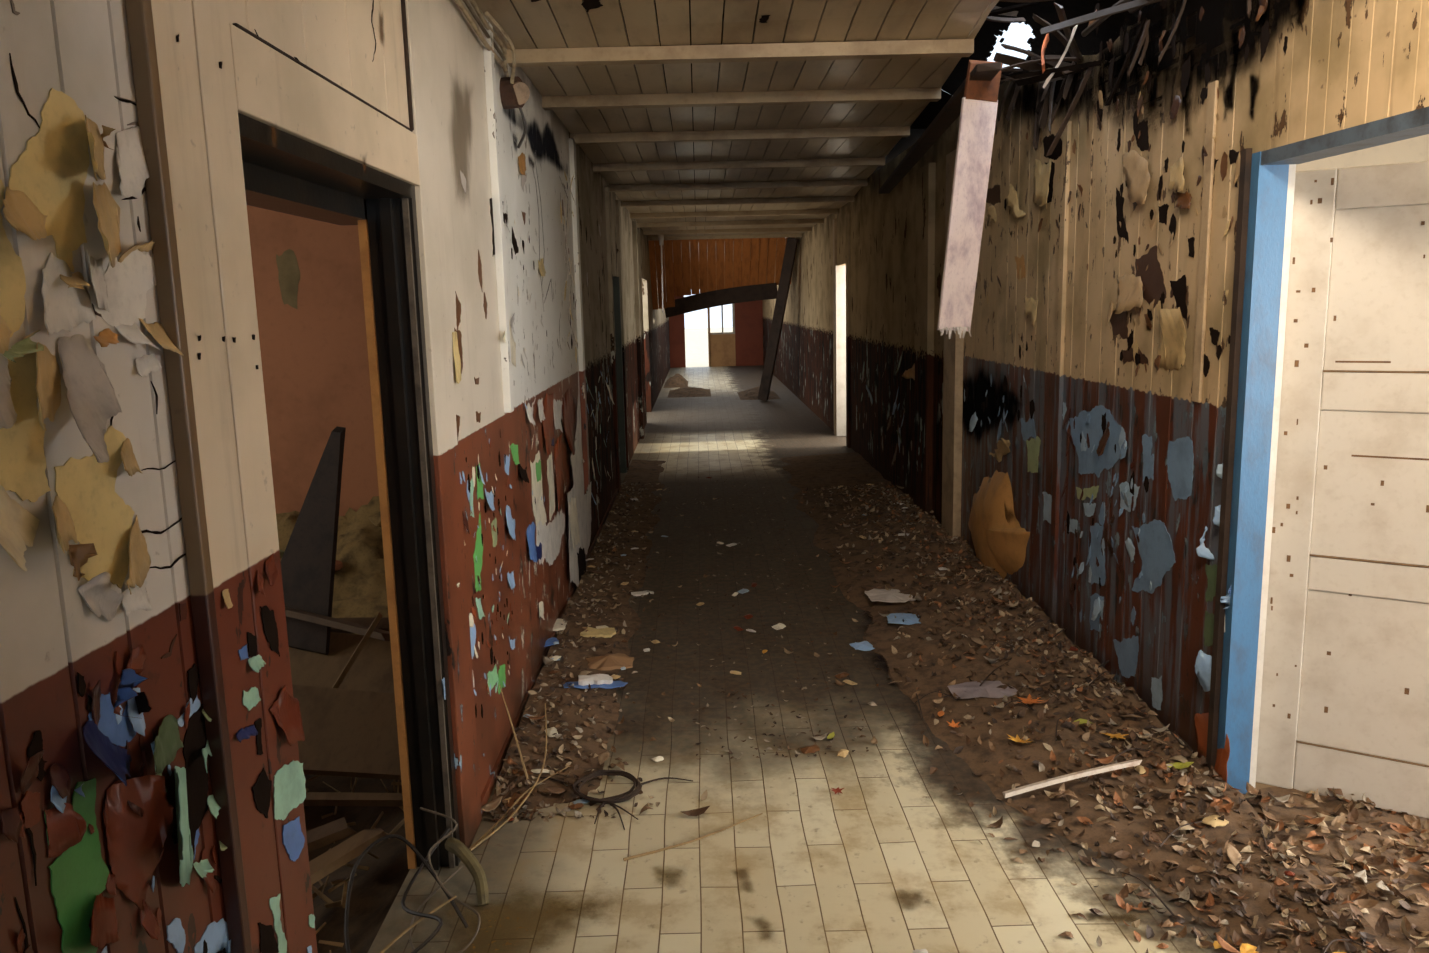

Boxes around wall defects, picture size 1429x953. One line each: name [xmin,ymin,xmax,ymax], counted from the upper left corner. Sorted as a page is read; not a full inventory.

crack [9,53,40,128]
crack [114,96,139,126]
crack [122,187,146,232]
spalling [986,0,1241,377]
leakage [1008,0,1306,132]
crack [150,381,158,414]
spalling [456,153,614,718]
crack [141,517,186,569]
peeling [1042,402,1194,710]
peeling [1194,505,1231,692]
peeling [0,645,231,953]
peeling [236,553,306,862]